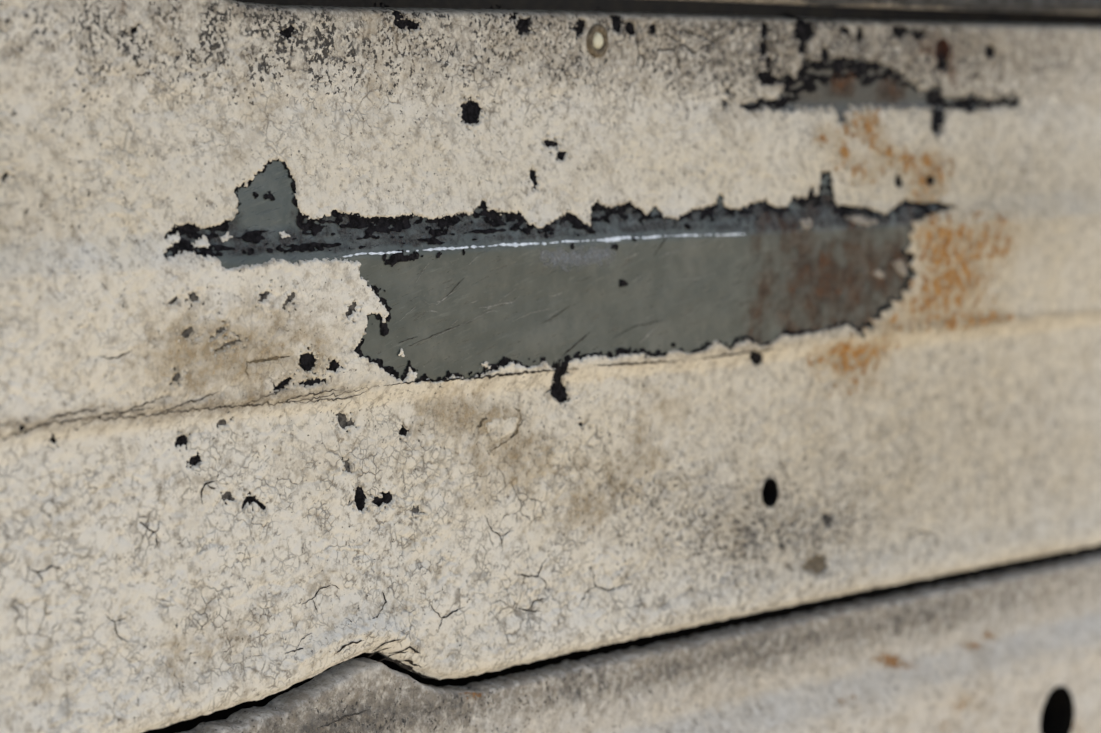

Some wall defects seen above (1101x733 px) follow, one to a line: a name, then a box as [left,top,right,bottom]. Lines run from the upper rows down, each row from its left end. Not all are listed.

peeling [596,6,635,36]
peeling [803,0,1101,14]
peeling [721,11,1020,139]
corrosion [807,107,1019,396]
peeling [163,159,954,403]
crack [27,565,62,585]
crack [515,561,547,612]
crack [580,567,625,603]
crack [285,585,339,654]
crack [430,604,464,633]
crack [369,647,439,680]